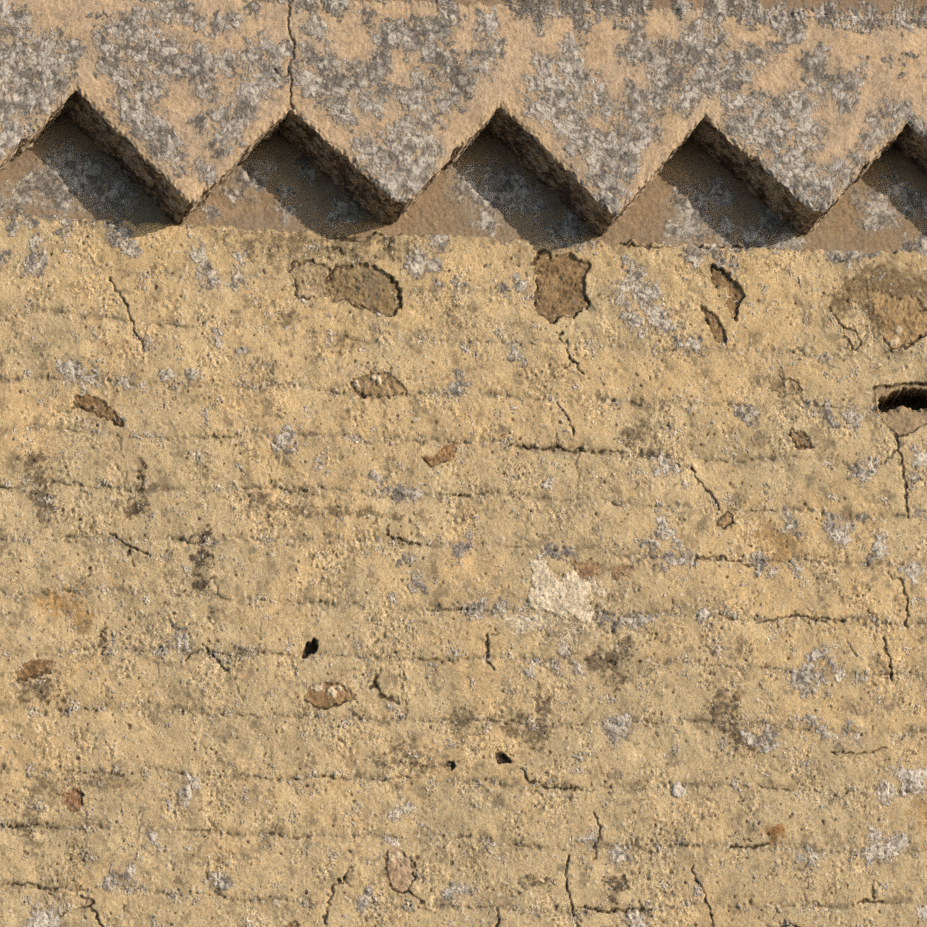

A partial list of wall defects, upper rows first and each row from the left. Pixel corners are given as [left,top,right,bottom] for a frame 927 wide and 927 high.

spalling [288,258,403,317]
spalling [531,249,591,324]
spalling [701,306,727,344]
spalling [710,264,745,321]
spalling [867,288,927,352]
spalling [74,394,123,427]
spalling [350,371,407,399]
spalling [874,381,927,436]
crack [884,435,909,518]
spalling [305,681,357,710]
crack [60,896,103,927]
crack [566,857,650,927]